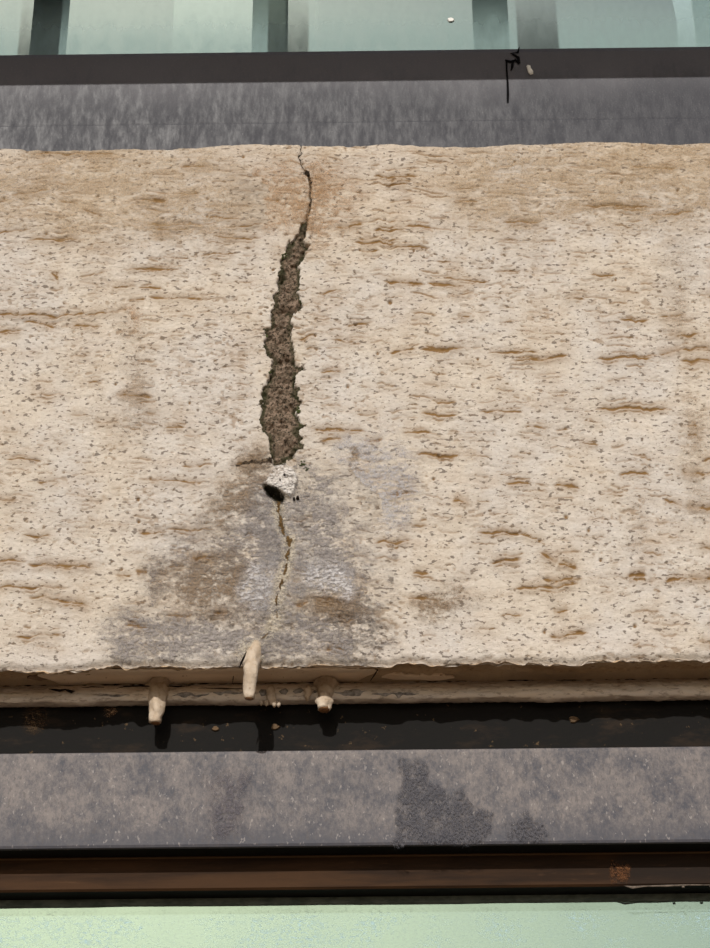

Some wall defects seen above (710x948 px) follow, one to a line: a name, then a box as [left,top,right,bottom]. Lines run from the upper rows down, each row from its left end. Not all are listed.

crack [235,148,312,471]
water stain [27,441,454,725]
crack [249,491,295,647]